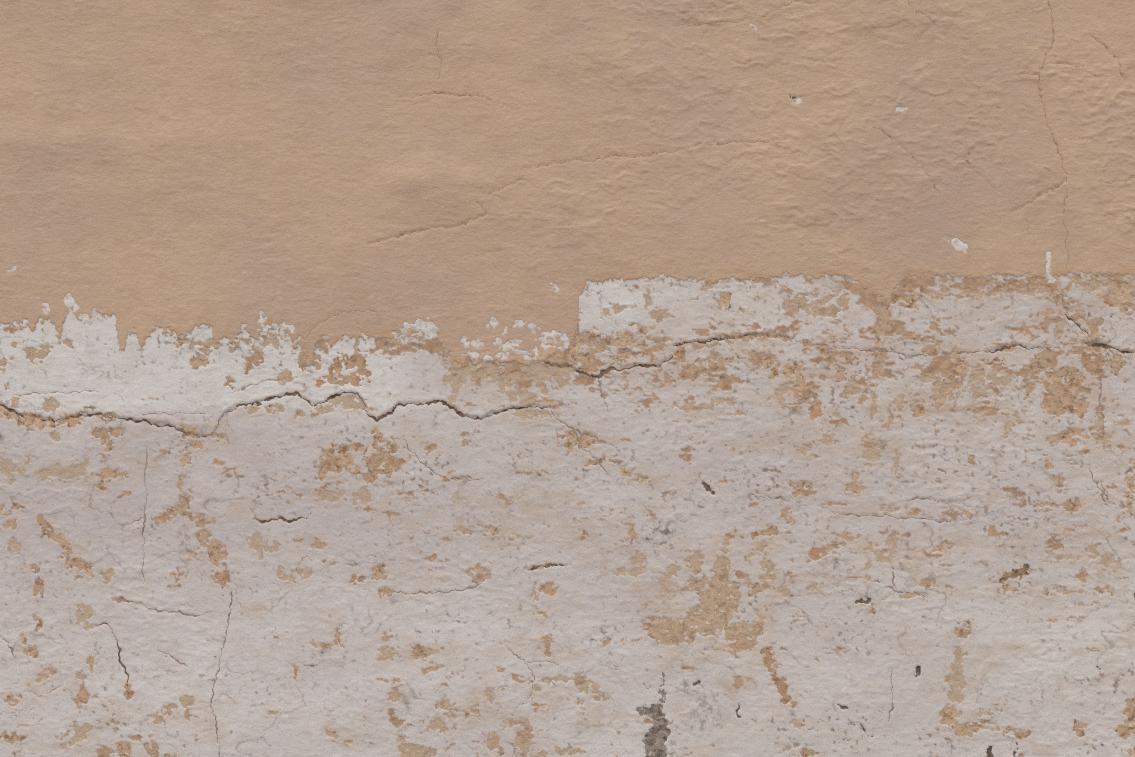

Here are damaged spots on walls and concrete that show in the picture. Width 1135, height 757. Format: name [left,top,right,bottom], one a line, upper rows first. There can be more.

crack [1014,0,1082,257]
peeling [0,339,122,452]
peeling [173,310,372,420]
peeling [444,251,1135,496]
crack [543,334,1048,410]
crack [1061,292,1135,507]
peeling [314,427,401,506]
crack [839,496,972,523]
crack [0,379,610,756]
peeling [647,481,813,729]
crack [872,565,927,600]
spalling [636,672,671,757]